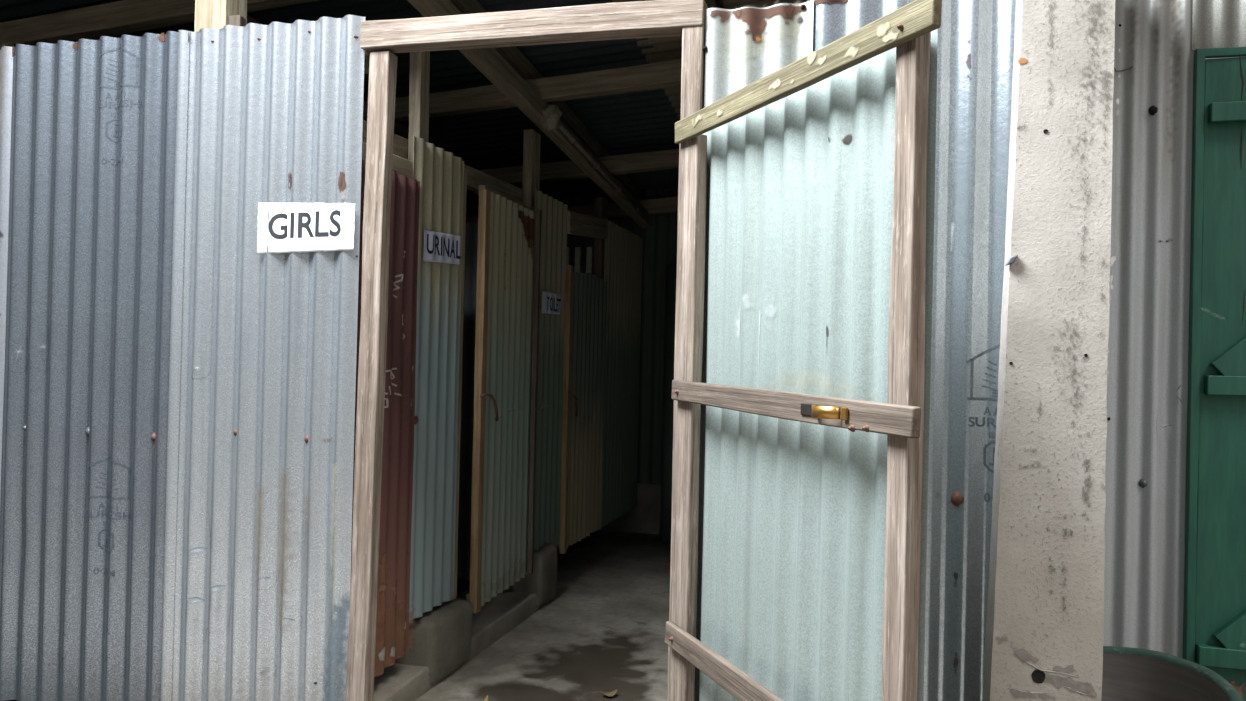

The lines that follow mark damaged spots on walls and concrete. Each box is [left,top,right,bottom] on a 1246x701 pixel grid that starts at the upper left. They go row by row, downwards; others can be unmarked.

corrosion [710,0,848,42]
leakage [1101,71,1111,161]
corrosion [517,205,534,258]
corrosion [375,554,412,674]